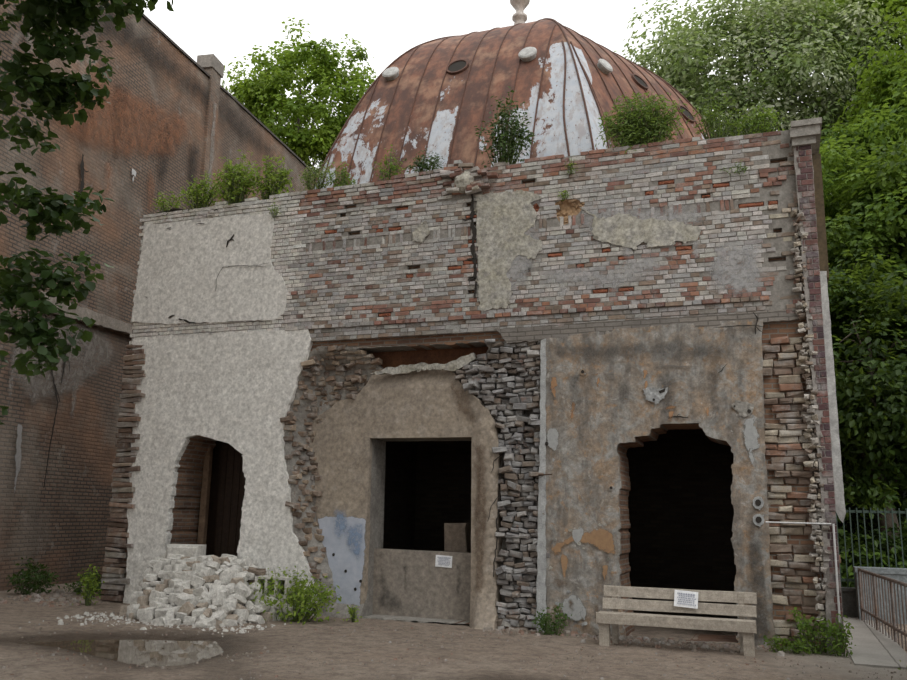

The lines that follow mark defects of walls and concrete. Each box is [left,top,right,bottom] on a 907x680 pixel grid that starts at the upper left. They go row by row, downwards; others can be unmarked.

crack [462,194,477,298]
peeling [448,190,563,312]
peeling [555,199,701,260]
spalling [280,339,615,631]